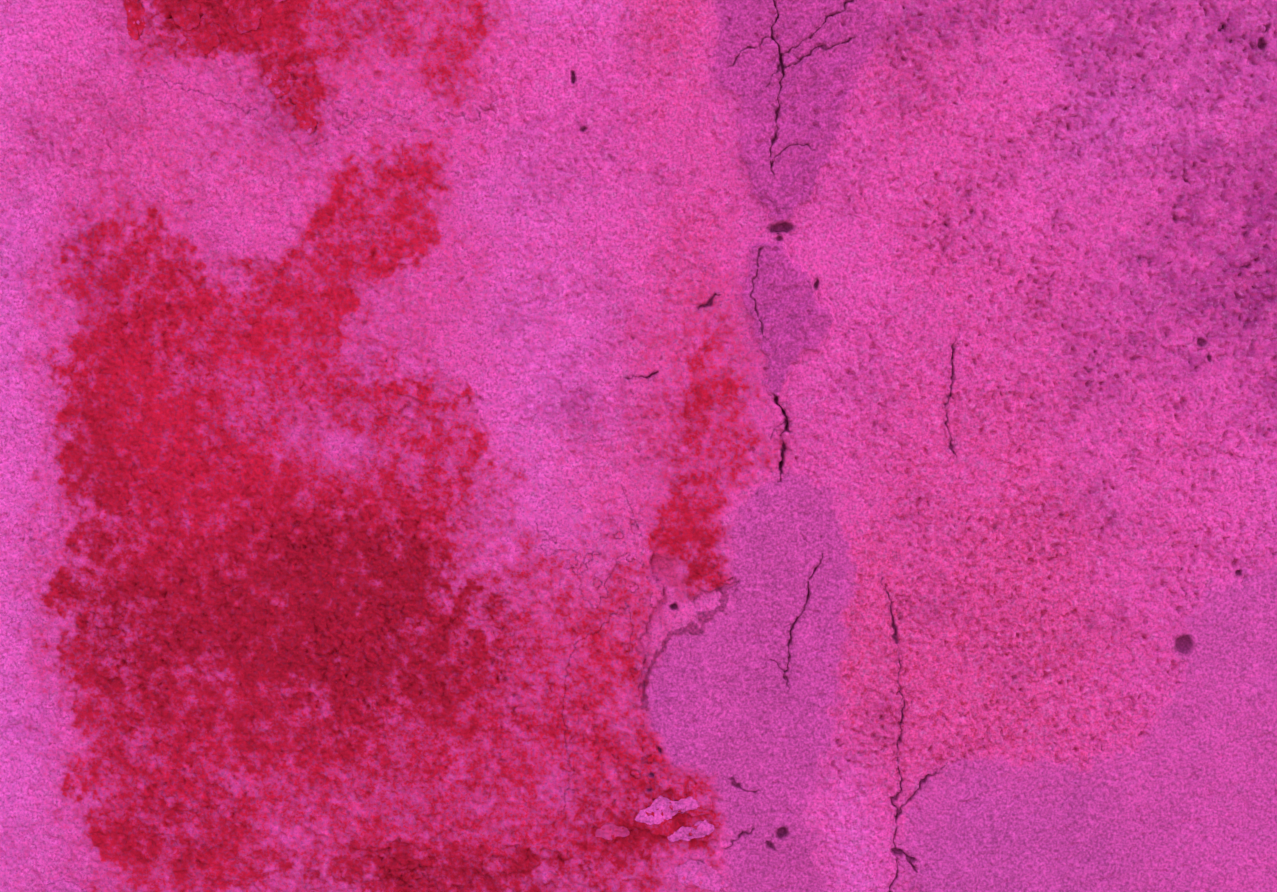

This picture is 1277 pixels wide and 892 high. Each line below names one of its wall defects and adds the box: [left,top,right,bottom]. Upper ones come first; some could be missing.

crack [728,0,858,178]
water stain [0,0,796,892]
crack [769,391,793,484]
crack [753,552,825,694]
crack [879,575,949,889]